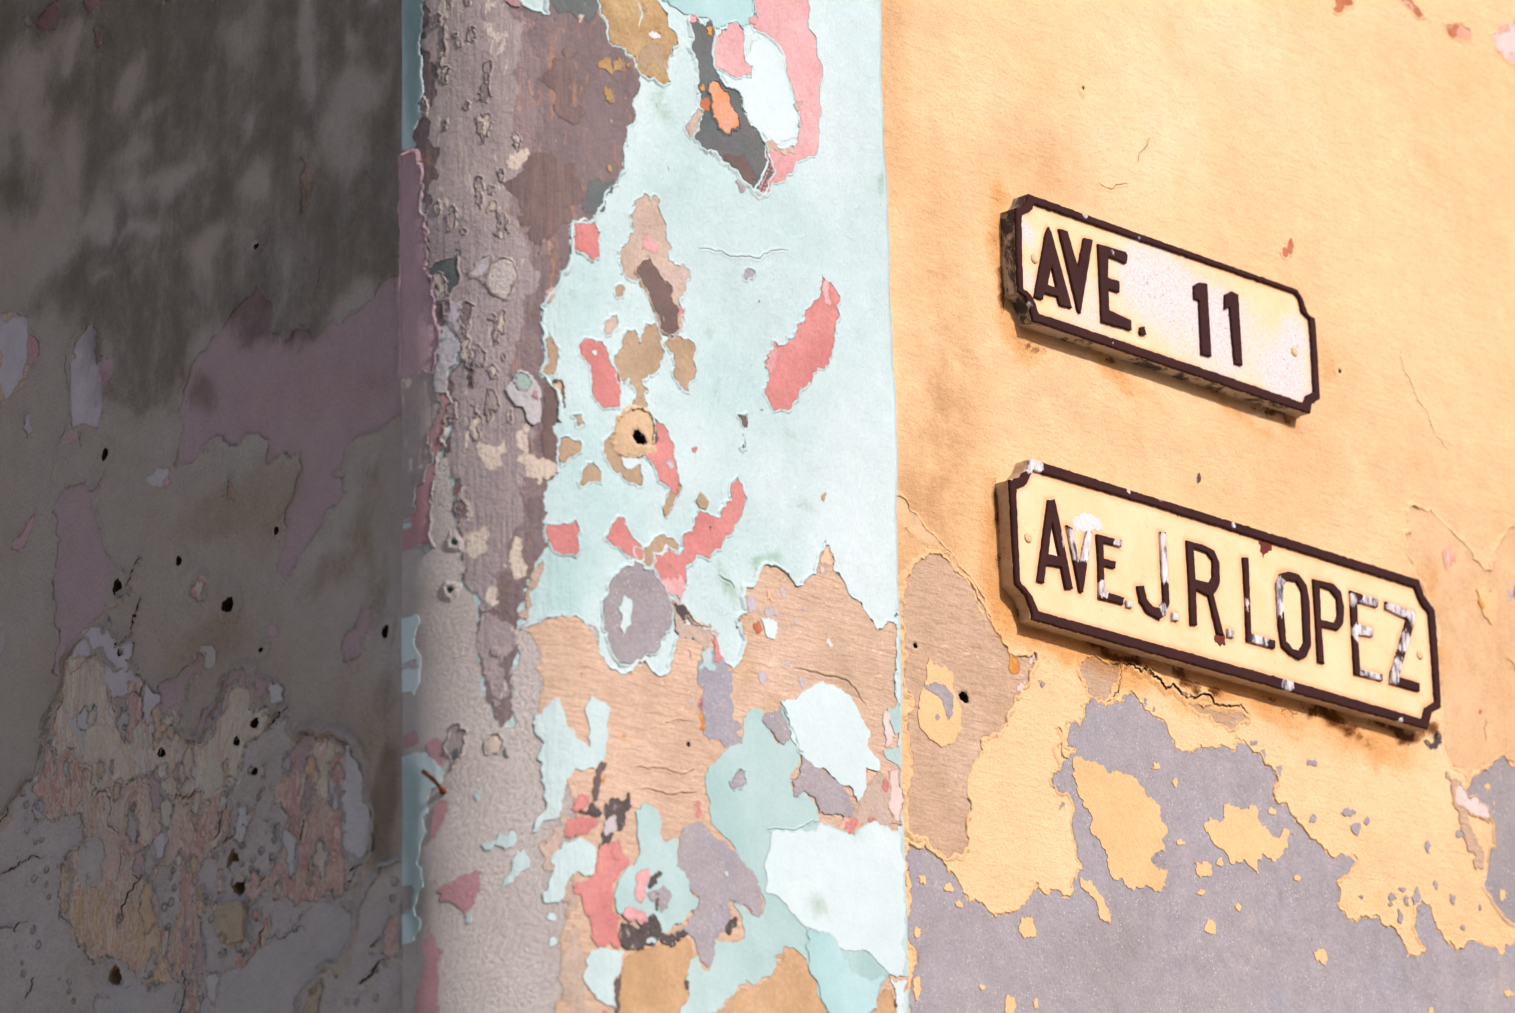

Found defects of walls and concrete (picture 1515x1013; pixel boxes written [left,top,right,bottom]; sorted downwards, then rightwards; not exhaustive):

peeling [682,0,825,201]
spalling [1442,14,1515,69]
peeling [761,273,842,415]
spalling [0,0,765,1013]
spalling [679,491,1515,1013]
crack [1104,657,1301,721]